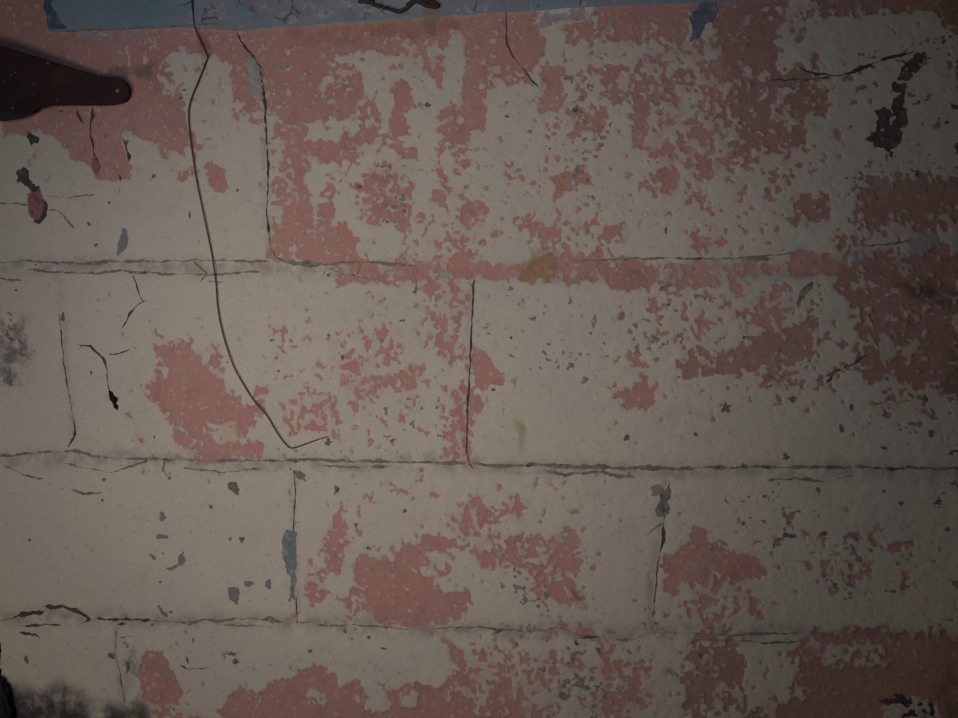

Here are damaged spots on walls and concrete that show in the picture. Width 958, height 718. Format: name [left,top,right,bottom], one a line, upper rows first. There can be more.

crack [0,0,417,328]
peeling [0,0,958,503]
crack [572,252,795,262]
peeling [126,651,204,718]
peeling [166,552,186,571]
peeling [216,467,653,718]
crack [0,279,958,707]
spalling [650,484,682,517]